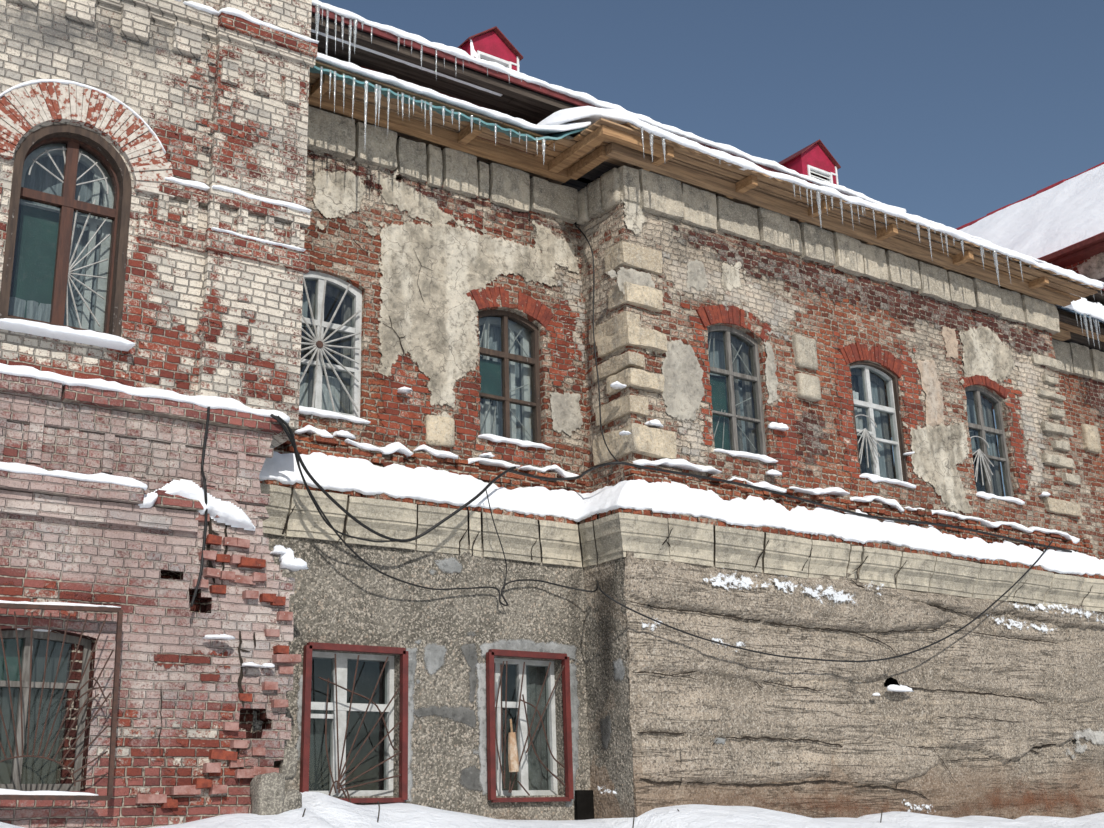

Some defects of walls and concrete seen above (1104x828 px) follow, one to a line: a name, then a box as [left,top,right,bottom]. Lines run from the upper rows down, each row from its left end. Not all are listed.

spalling [165,51,279,184]
spalling [104,293,299,412]
flaking render [273,150,592,494]
spalling [624,224,1104,560]
spalling [96,704,259,825]
spalling [154,650,231,688]
crack [637,731,686,750]
crack [712,736,854,748]
crack [640,775,929,800]
crack [755,681,823,691]
crack [621,600,1060,653]
crack [904,668,1056,782]